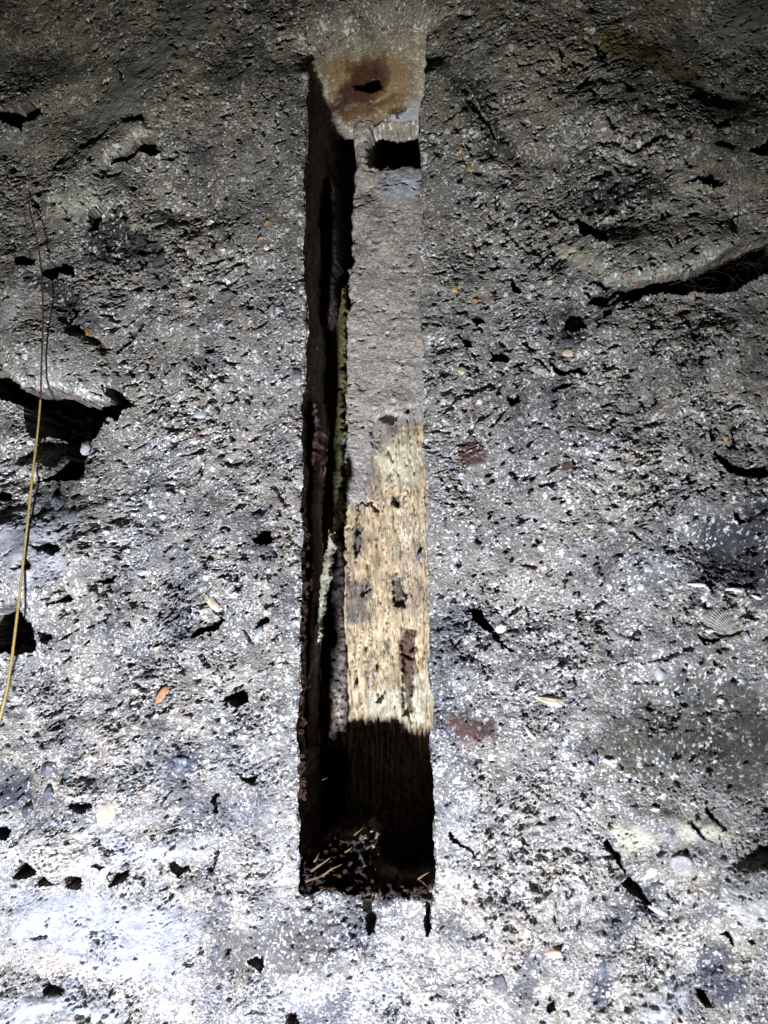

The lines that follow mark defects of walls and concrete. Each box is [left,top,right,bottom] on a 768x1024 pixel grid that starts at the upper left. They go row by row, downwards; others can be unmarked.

corrosion [325,48,413,125]
spalling [0,371,135,484]
crack [600,838,655,914]